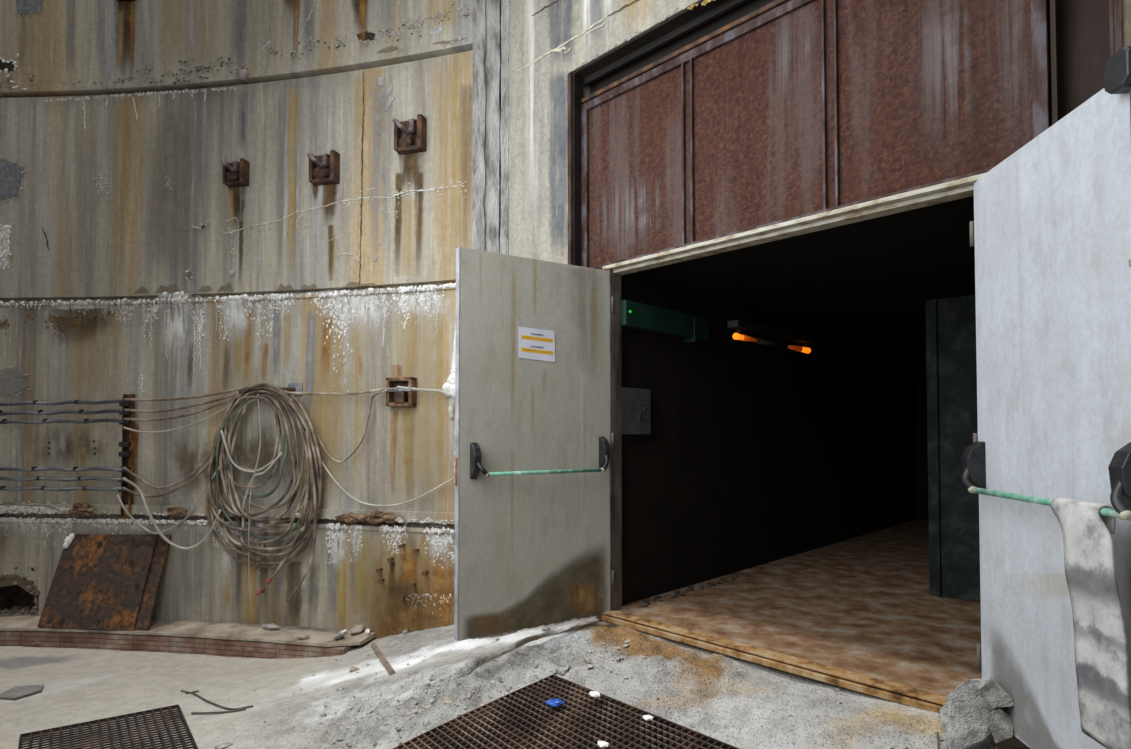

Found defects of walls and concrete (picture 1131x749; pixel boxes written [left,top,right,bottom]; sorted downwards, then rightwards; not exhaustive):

corrosion [117,1,134,59]
corrosion [354,0,366,33]
spalling [0,54,41,98]
damp [0,225,12,272]
corrosion [230,187,244,265]
corrosion [395,152,422,251]
damp [0,283,456,407]
damp [442,322,456,434]
damp [238,434,290,473]
damp [313,516,455,569]
spalling [0,574,40,615]
damp [468,554,603,639]